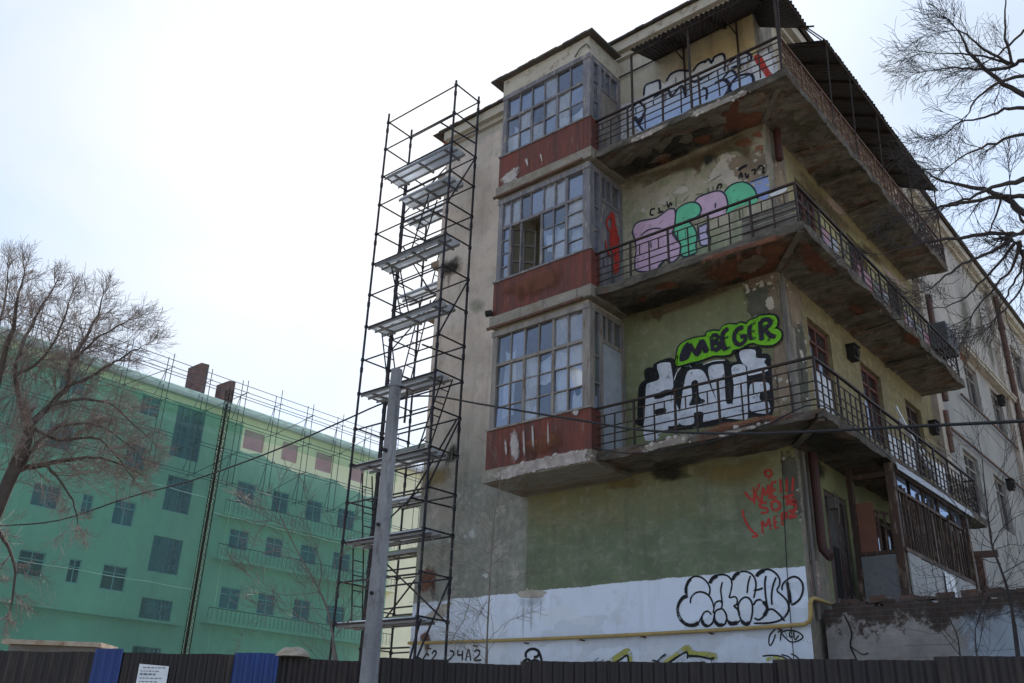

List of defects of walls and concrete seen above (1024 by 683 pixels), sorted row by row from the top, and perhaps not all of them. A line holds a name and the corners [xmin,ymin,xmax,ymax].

peeling [502,159,528,183]
flaking render [703,131,770,192]
spalling [494,424,594,480]